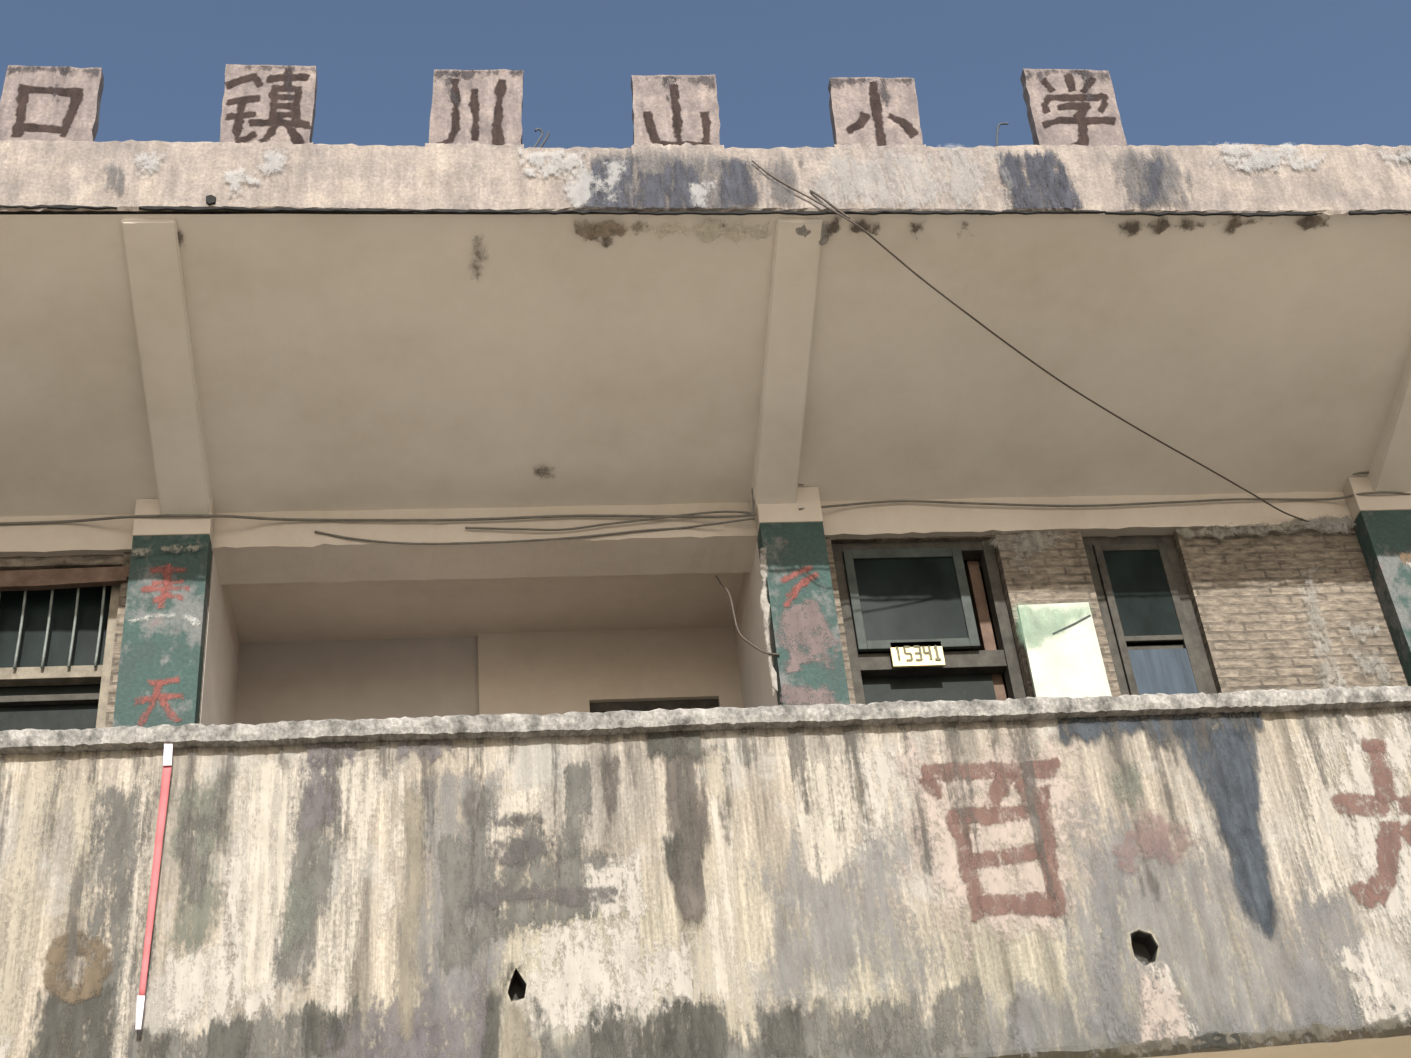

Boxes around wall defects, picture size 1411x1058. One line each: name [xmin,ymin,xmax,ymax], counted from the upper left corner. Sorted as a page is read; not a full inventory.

peeling [519,148,648,248]
water stain [582,148,805,208]
peeling [690,182,714,207]
water stain [997,150,1083,209]
water stain [1113,148,1192,208]
spalling [1119,219,1204,236]
spalling [1226,215,1255,233]
spalling [1297,216,1328,230]
water stain [0,706,1411,1058]
spalling [1099,939,1411,1057]